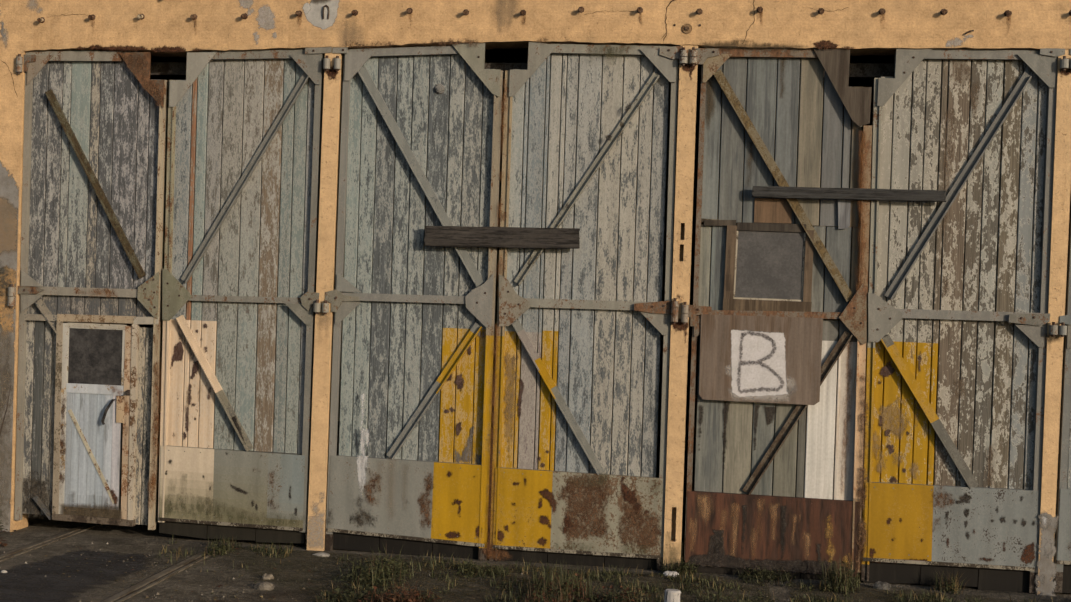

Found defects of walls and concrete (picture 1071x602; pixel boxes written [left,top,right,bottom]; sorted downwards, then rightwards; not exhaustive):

peeling [239,0,277,44]
spalling [303,0,339,30]
flaking render [0,161,19,532]